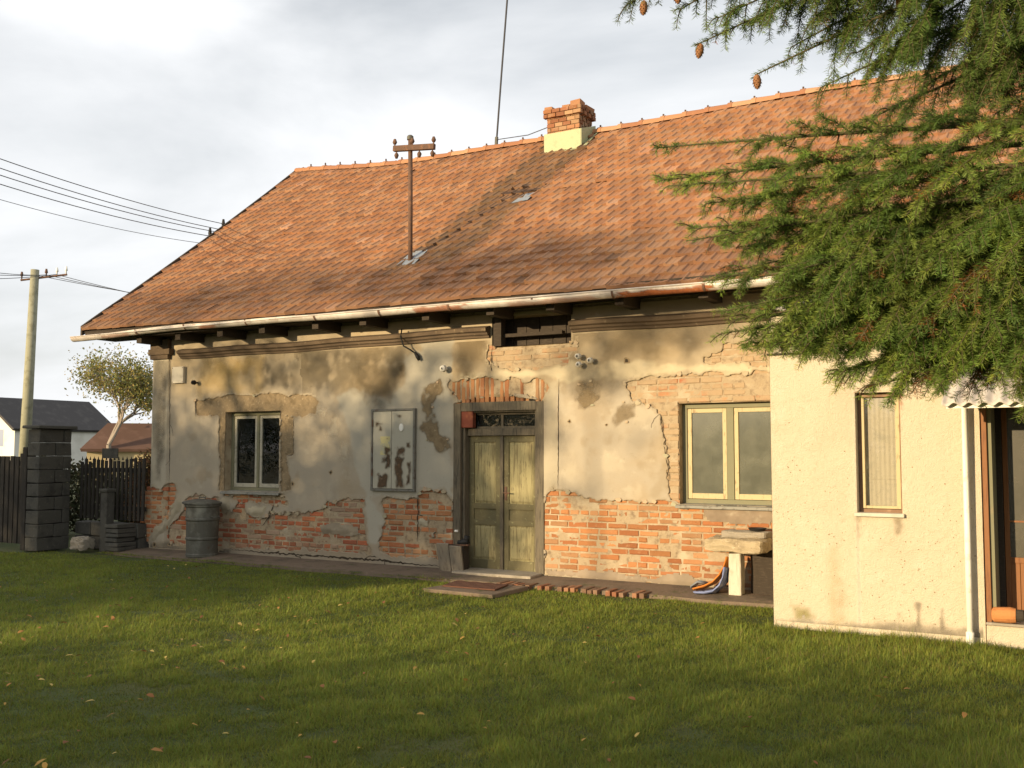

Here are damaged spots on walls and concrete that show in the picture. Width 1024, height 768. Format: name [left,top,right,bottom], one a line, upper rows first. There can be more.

spalling [420,340,579,452]
flaking render [136,481,453,560]
flaking render [545,341,846,588]